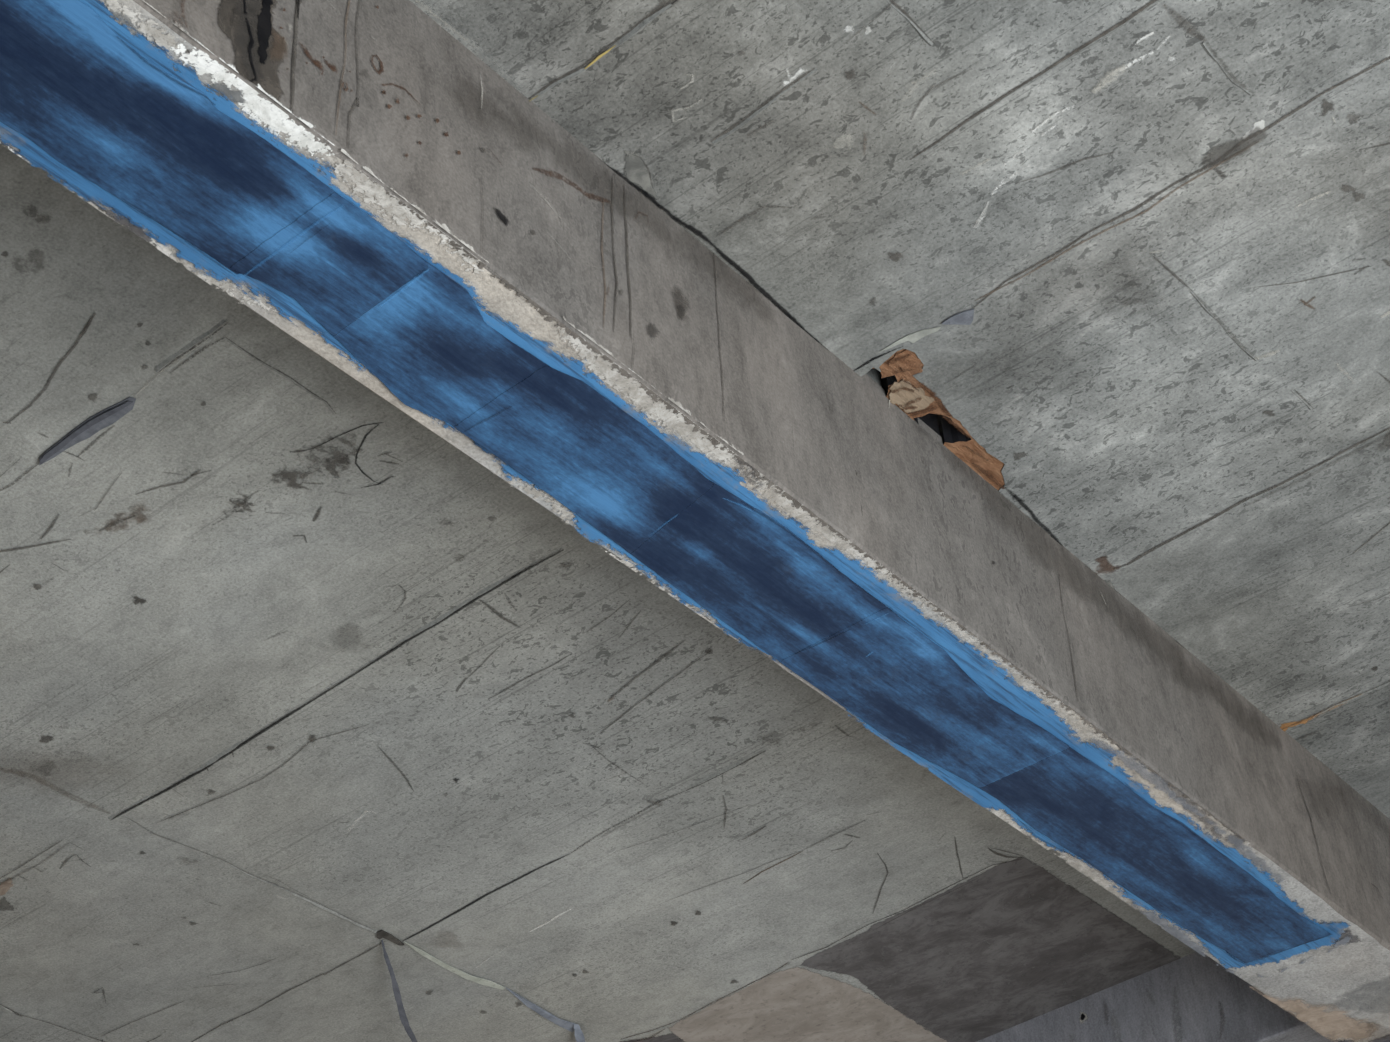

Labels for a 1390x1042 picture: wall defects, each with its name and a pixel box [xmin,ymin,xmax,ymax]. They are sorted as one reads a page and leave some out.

spalling [0,0,550,432]
spalling [454,299,1351,969]